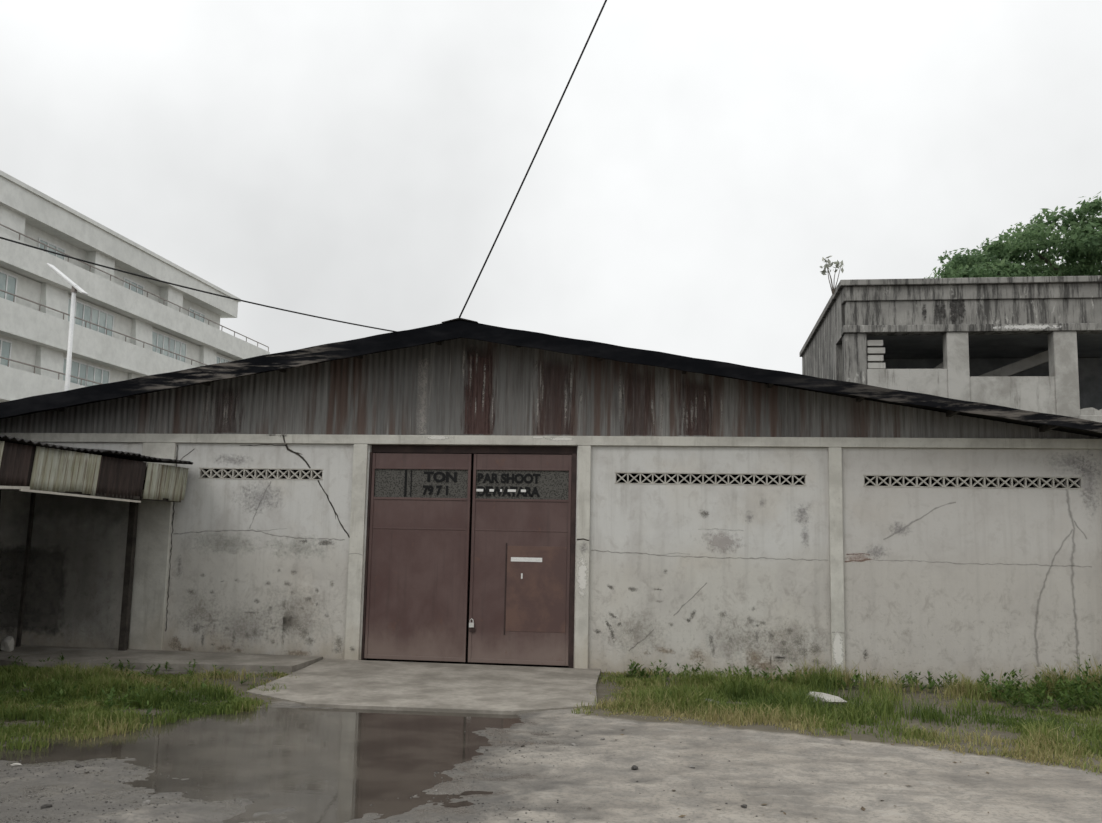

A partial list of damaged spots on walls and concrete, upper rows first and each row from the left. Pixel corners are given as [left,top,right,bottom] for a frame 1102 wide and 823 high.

damp [922,300,965,322]
corrosion [460,350,495,434]
corrosion [533,363,582,435]
corrosion [651,384,723,435]
crack [240,436,350,538]